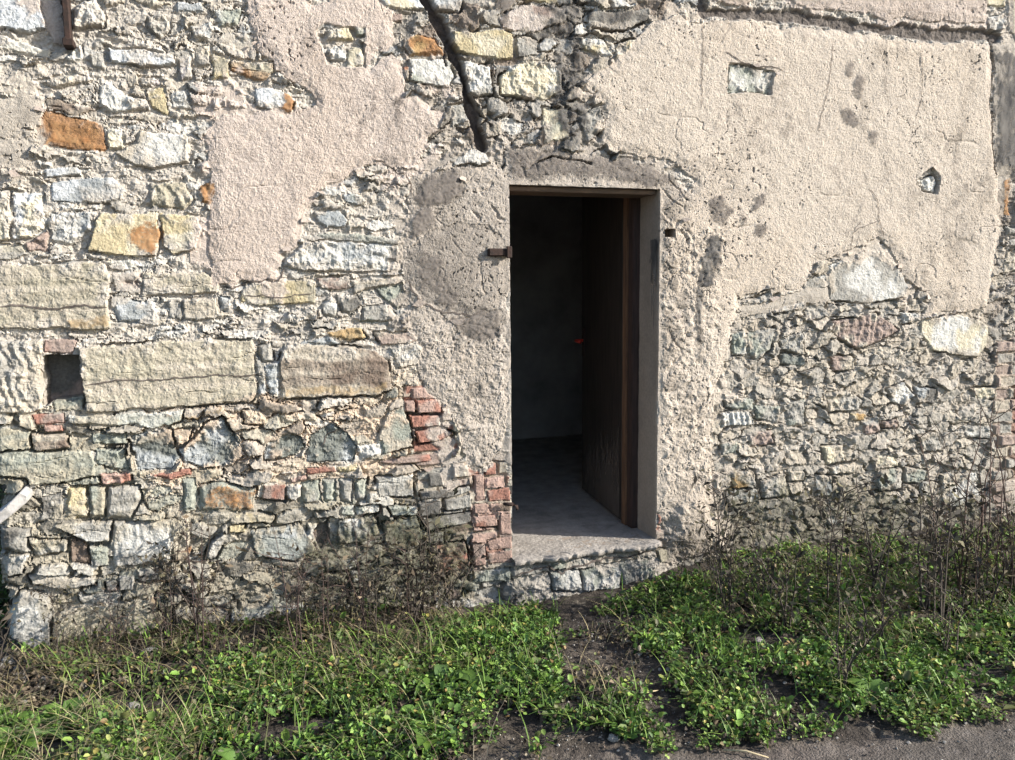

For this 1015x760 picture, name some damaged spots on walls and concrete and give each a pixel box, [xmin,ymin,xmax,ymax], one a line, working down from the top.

peeling [0,86,48,177]
spalling [323,22,371,68]
crack [697,0,1001,175]
leakage [842,108,859,127]
leakage [847,61,866,99]
peeling [283,149,523,344]
leakage [413,169,465,239]
leakage [417,252,501,341]
peeling [660,189,726,417]
leakage [695,194,768,360]
spalling [738,236,993,361]
spalling [916,166,941,194]